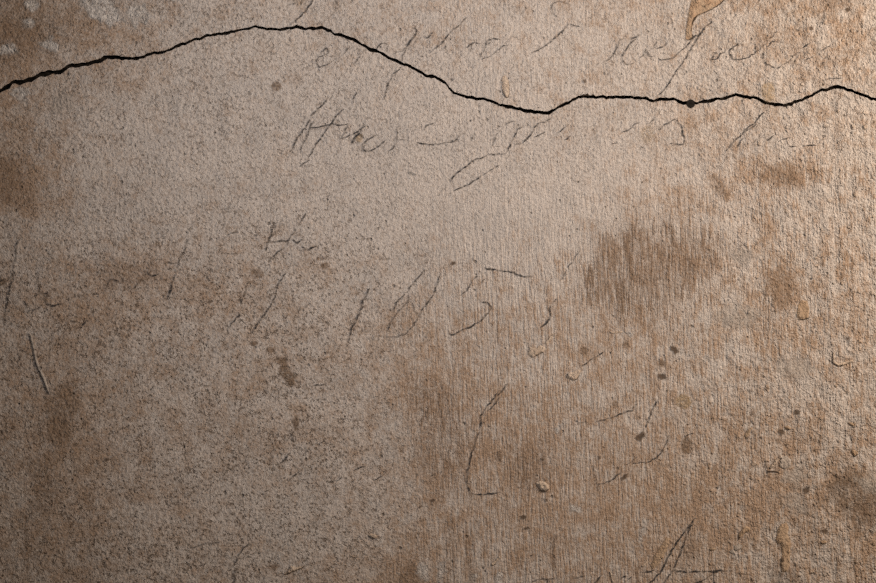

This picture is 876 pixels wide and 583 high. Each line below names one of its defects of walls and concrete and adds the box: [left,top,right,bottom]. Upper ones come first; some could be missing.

flaking render [686,0,724,40]
crack [0,25,876,115]